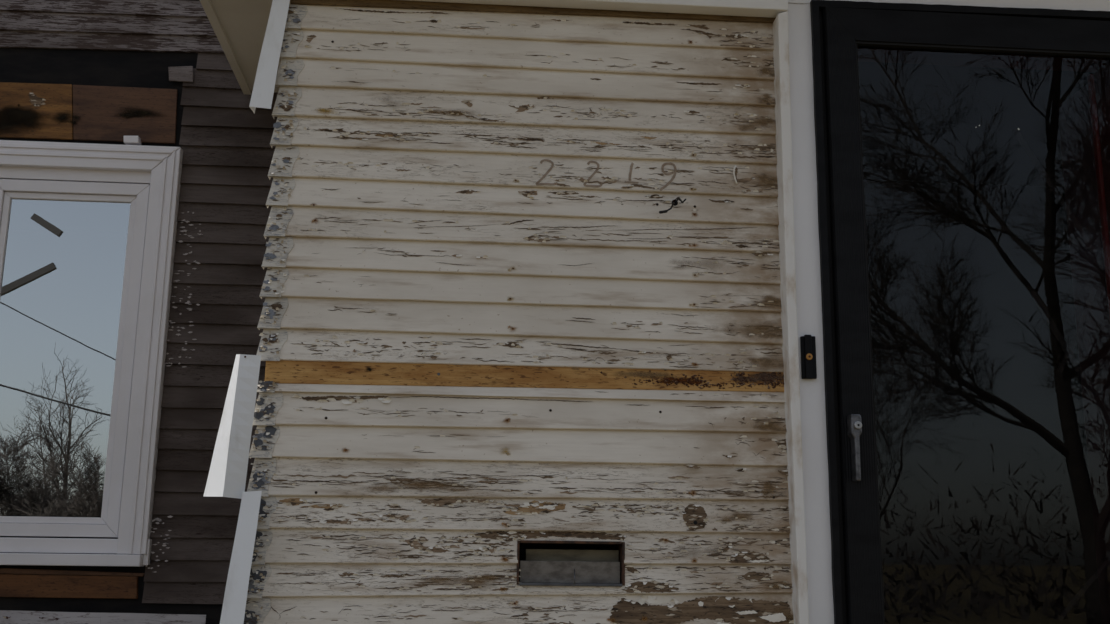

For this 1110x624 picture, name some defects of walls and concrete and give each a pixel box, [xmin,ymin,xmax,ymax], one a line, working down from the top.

peeling [623,22,748,39]
peeling [441,96,554,122]
peeling [259,6,316,355]
peeling [518,176,597,199]
peeling [602,176,665,198]
peeling [244,380,411,624]
peeling [418,498,566,515]
peeling [682,504,709,531]
peeling [408,542,449,553]
peeling [469,530,627,551]
peeling [610,546,794,624]